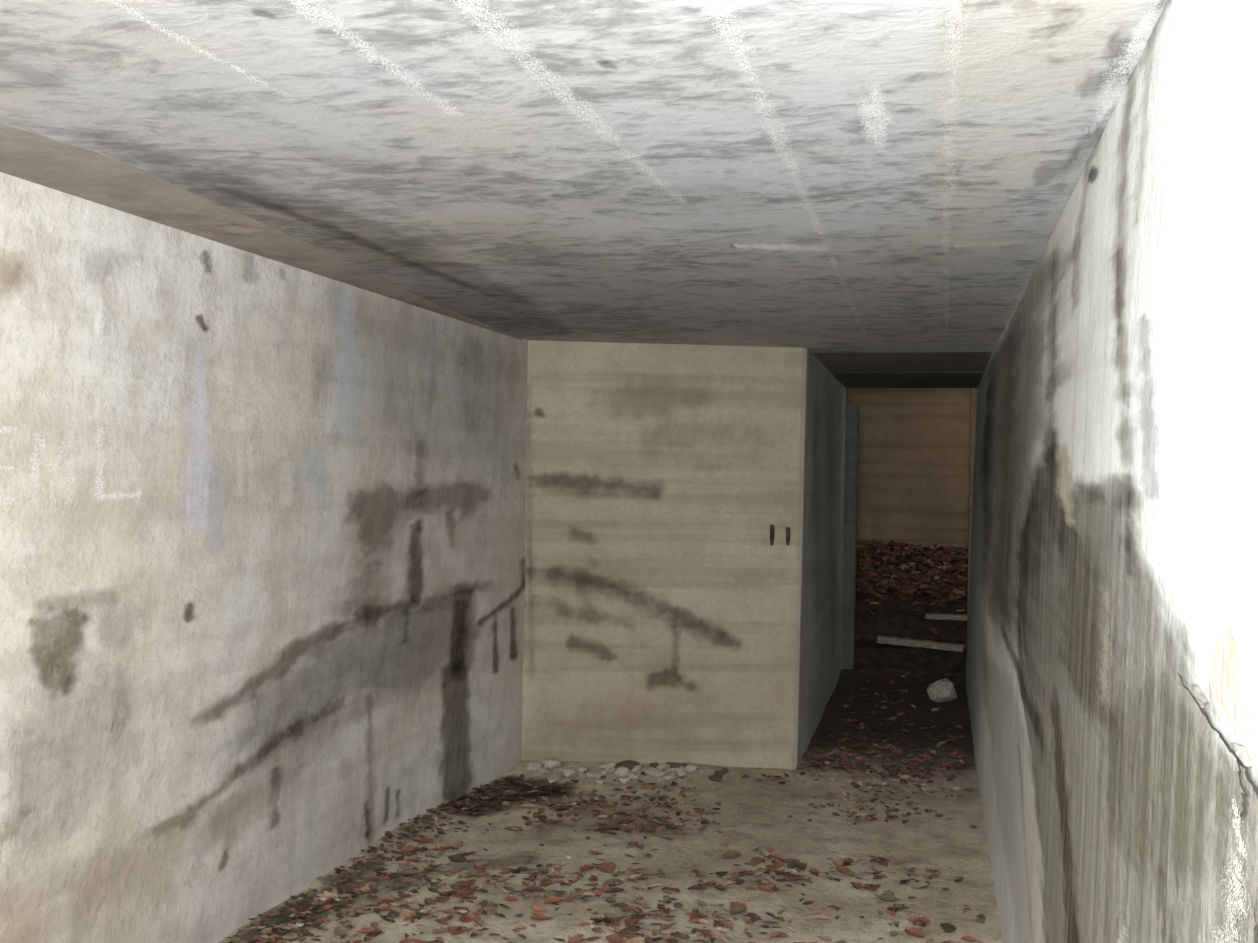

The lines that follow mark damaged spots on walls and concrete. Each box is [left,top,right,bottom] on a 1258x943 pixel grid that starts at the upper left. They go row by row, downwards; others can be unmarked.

water stain [444,670,570,817]
water stain [1018,443,1258,943]
crack [1176,671,1258,824]
crack [1250,909,1258,943]